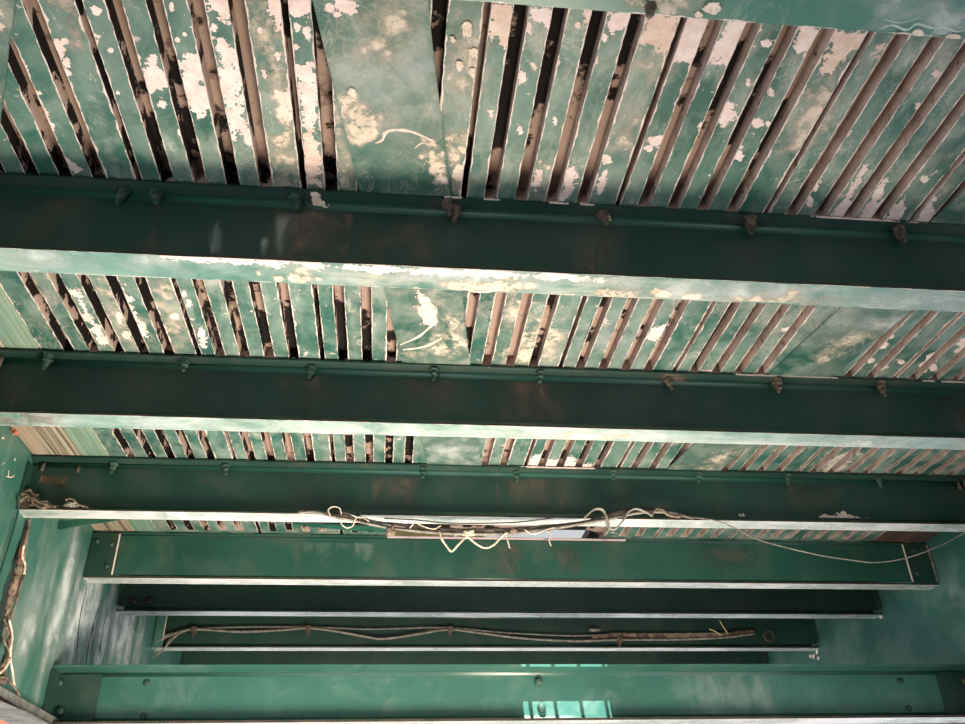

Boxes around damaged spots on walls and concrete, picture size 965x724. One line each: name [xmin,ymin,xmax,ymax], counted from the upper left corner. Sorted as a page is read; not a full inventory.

peeling [257,0,312,50]
peeling [488,3,513,50]
peeling [639,15,708,64]
peeling [708,21,746,65]
peeling [138,53,168,109]
peeling [175,32,210,120]
peeling [205,0,252,147]
peeling [284,61,323,187]
peeling [549,154,612,206]
peeling [806,163,937,223]
peeling [159,255,605,283]
peeling [116,280,149,339]